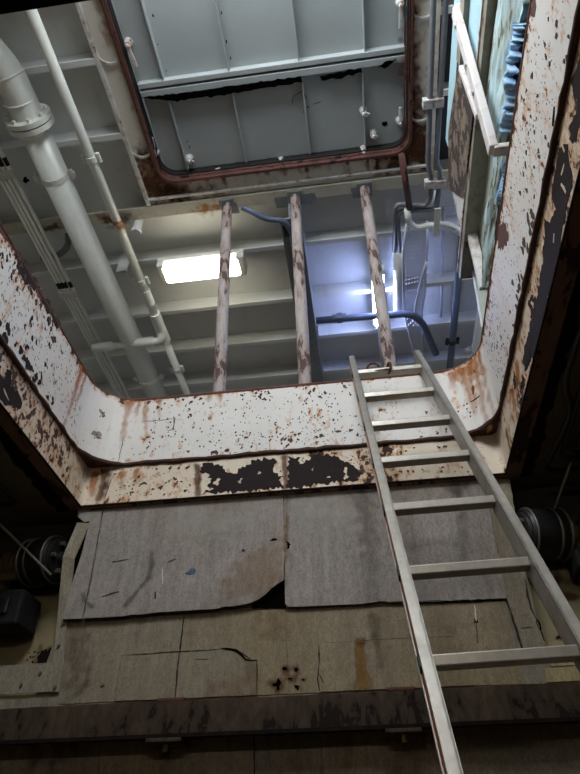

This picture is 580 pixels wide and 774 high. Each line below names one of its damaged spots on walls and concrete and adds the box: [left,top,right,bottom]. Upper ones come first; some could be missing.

corrosion [136,151,213,202]
peeling [483,0,580,406]
peeling [114,382,374,499]
hole [273,666,305,690]
corrosion [354,639,370,692]